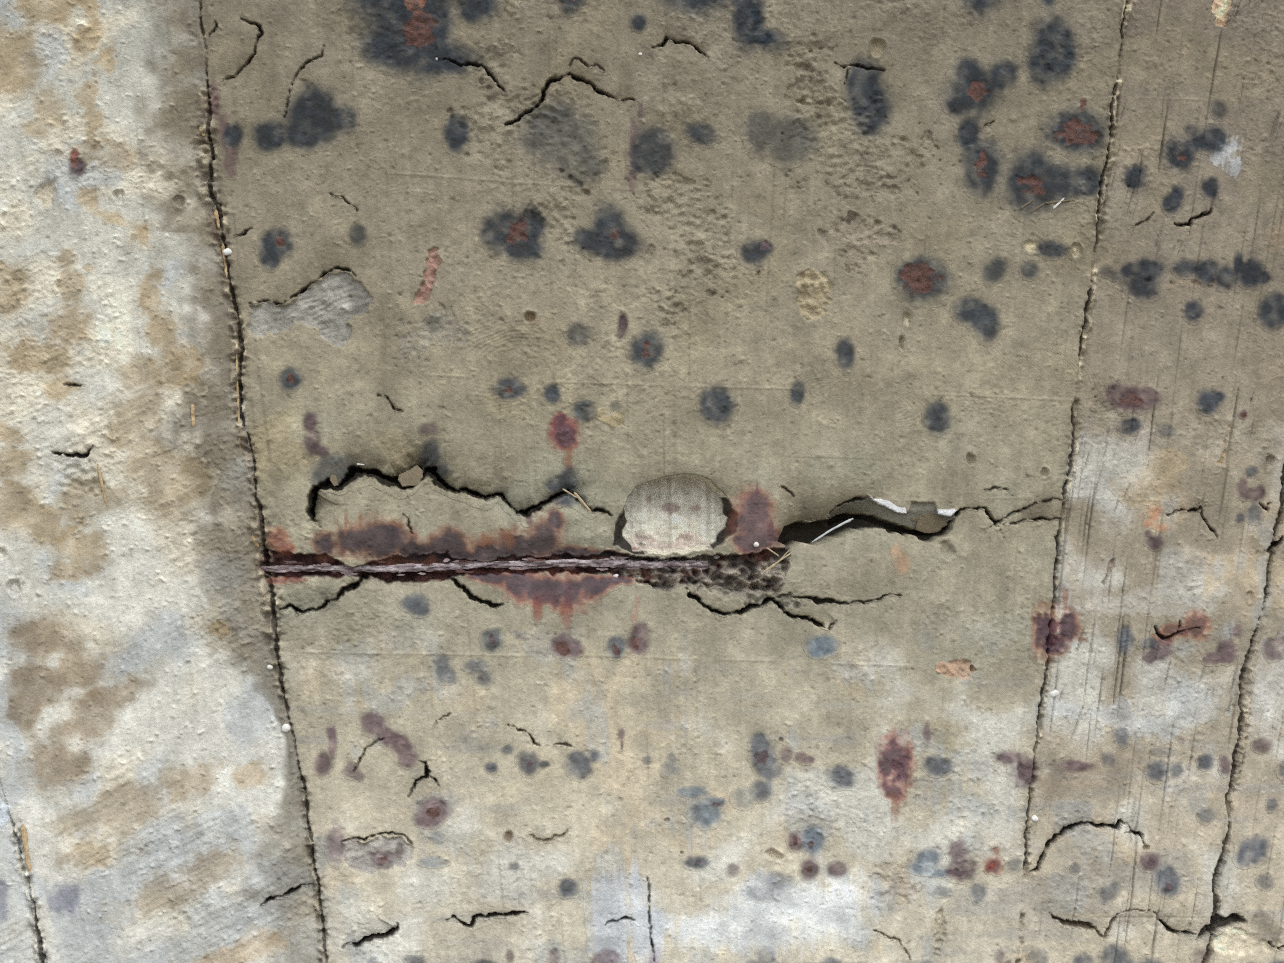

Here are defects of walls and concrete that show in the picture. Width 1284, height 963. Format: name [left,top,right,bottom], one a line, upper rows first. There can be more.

rust [338,0,504,91]
crack [435,57,639,126]
leakage [1204,132,1249,179]
spalling [246,272,373,348]
spalling [262,548,507,586]
rust [262,374,652,689]
spalling [531,473,798,609]
leakage [1035,623,1284,804]
rust [874,719,956,824]
crack [1028,819,1145,874]
leakage [582,845,895,963]
crack [1049,909,1284,951]